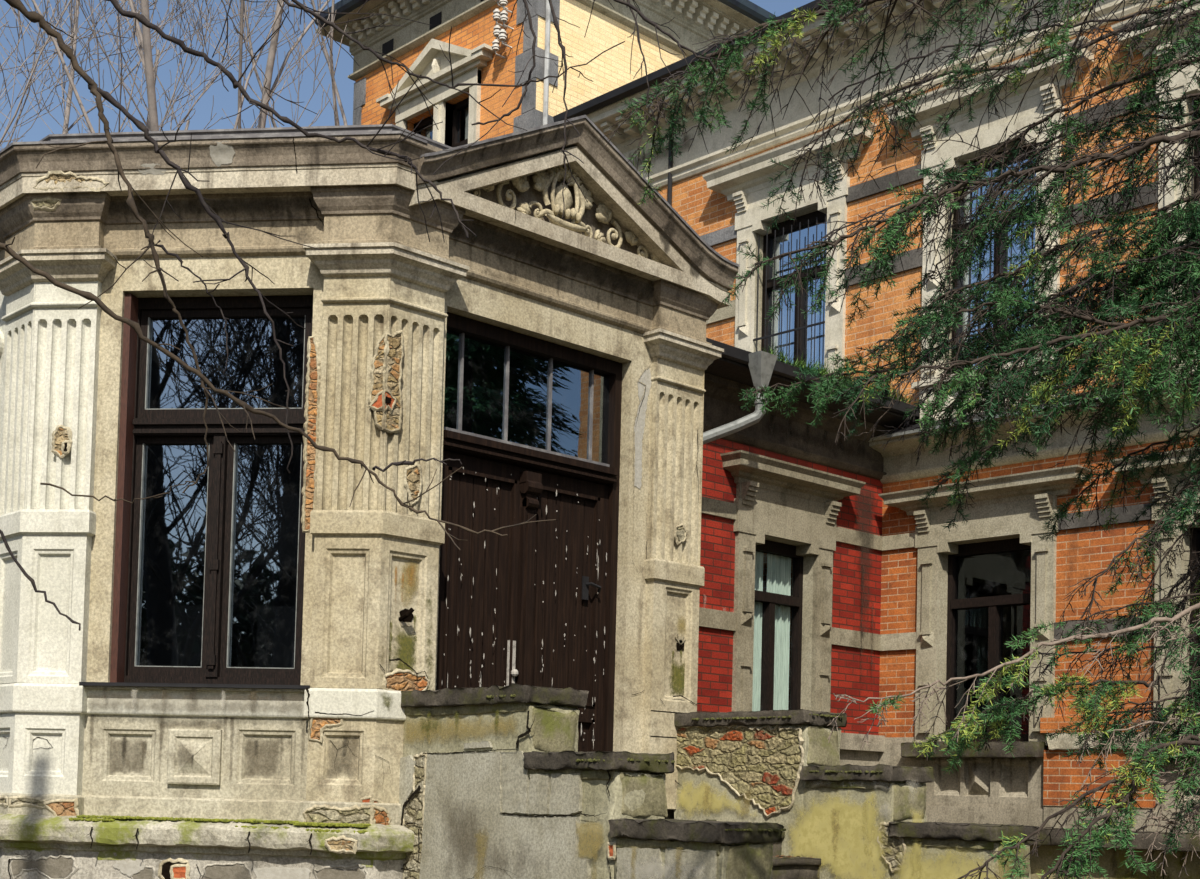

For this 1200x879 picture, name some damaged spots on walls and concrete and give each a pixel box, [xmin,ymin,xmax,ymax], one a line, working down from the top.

spalling [368,330,404,433]
spalling [51,425,72,459]
spalling [301,336,321,533]
spalling [404,462,423,506]
spalling [382,668,430,691]
peeling [446,609,496,688]
spalling [308,718,344,743]
spalling [676,725,804,818]
flaking render [7,854,79,879]
spalling [113,752,427,879]
leakage [790,795,1006,879]